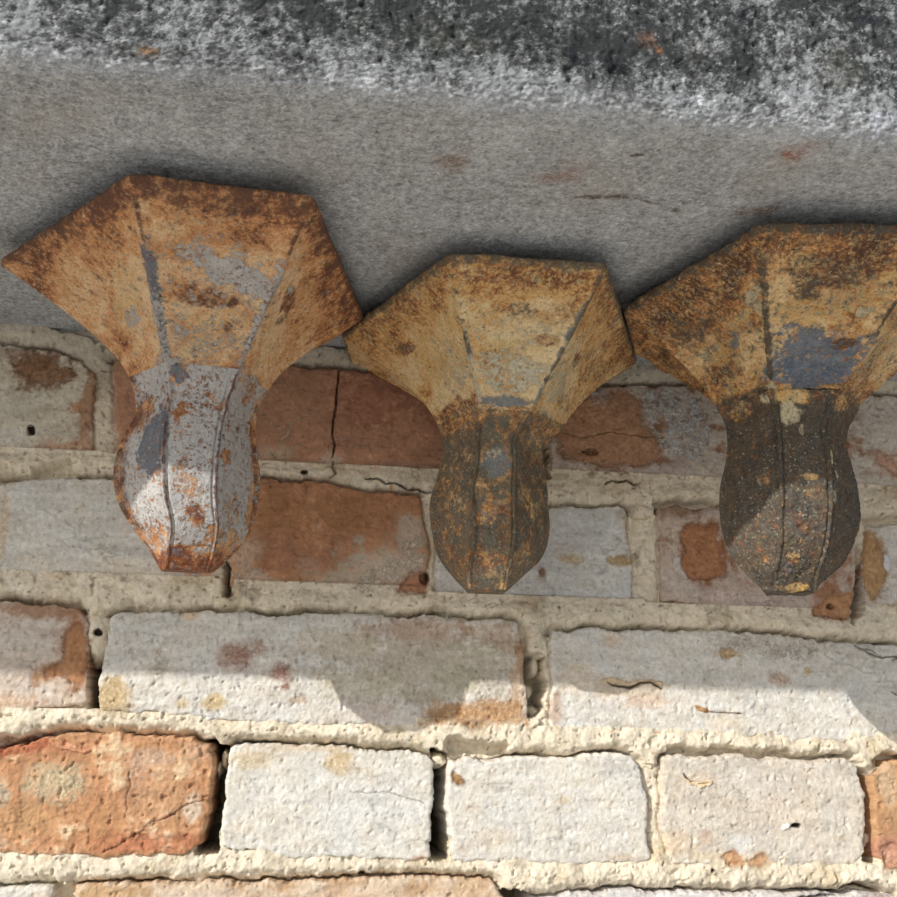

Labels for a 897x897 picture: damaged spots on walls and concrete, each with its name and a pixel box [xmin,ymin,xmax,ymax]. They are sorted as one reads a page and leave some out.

crack [331,370,339,478]
rust [606,555,632,566]
crack [102,781,206,853]